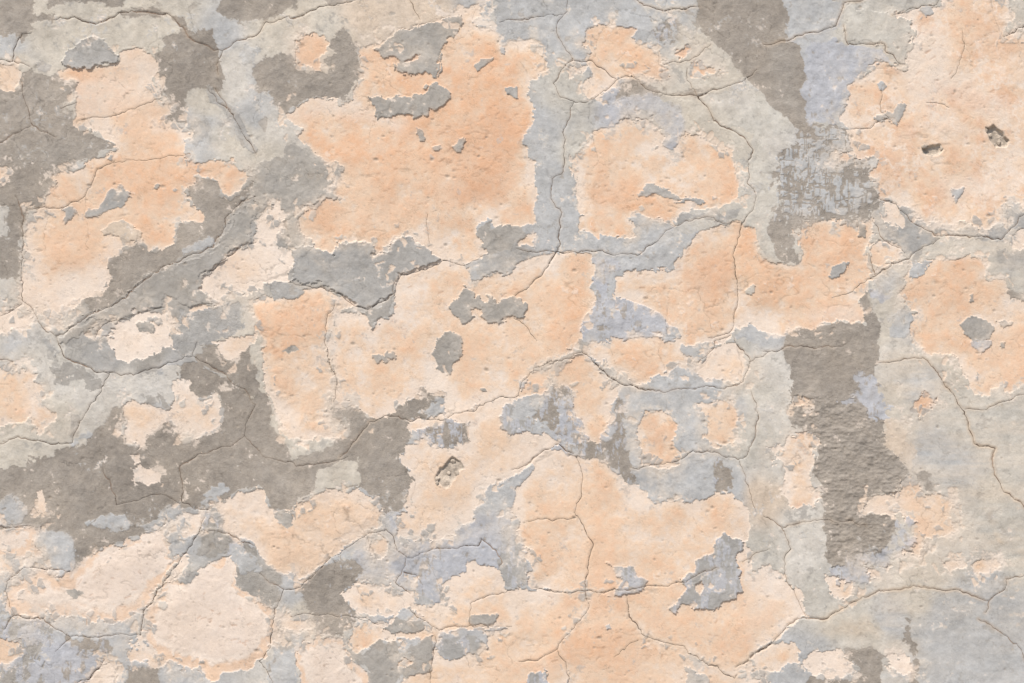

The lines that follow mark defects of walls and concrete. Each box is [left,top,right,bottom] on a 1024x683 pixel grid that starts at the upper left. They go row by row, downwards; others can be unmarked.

crack [0,33,55,143]
crack [64,1,352,153]
crack [3,198,522,647]
peeling [0,0,550,392]
crack [259,532,512,683]
peeling [0,91,810,683]
peeling [566,24,672,102]
crack [501,0,1024,681]
peeling [591,0,1024,398]
peeling [765,291,957,601]